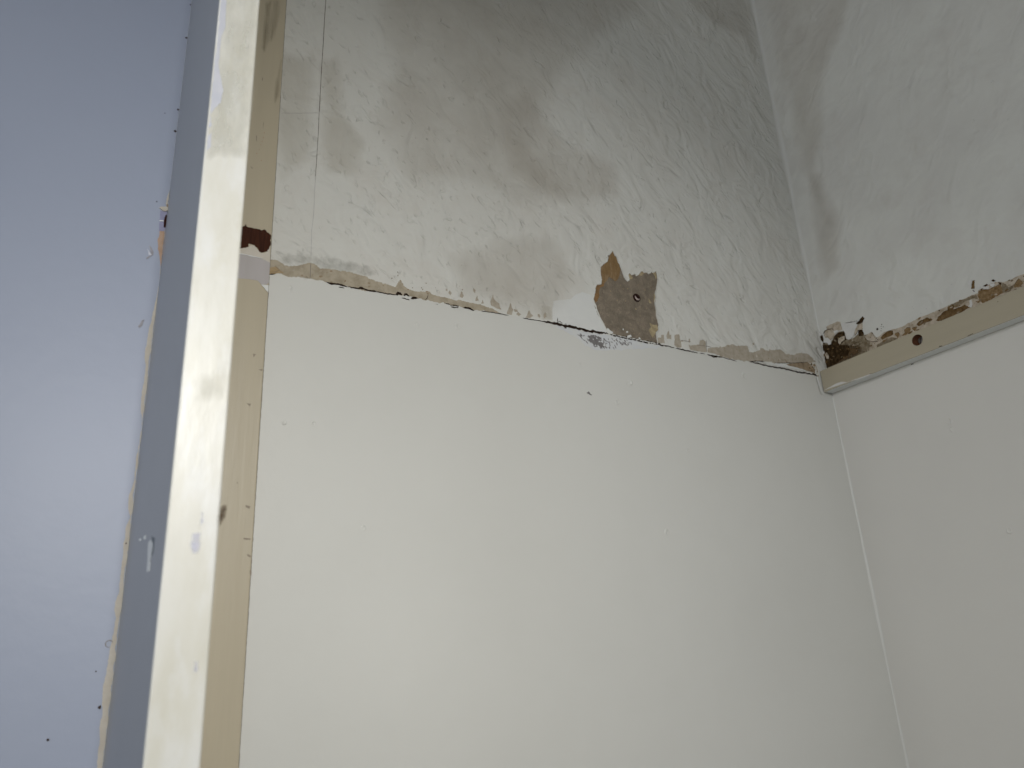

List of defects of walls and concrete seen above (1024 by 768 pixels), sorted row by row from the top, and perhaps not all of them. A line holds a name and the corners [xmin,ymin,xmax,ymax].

flaking render [240,224,547,319]
crack [307,277,817,376]
peeling [579,250,819,376]
flaking render [869,274,1024,351]